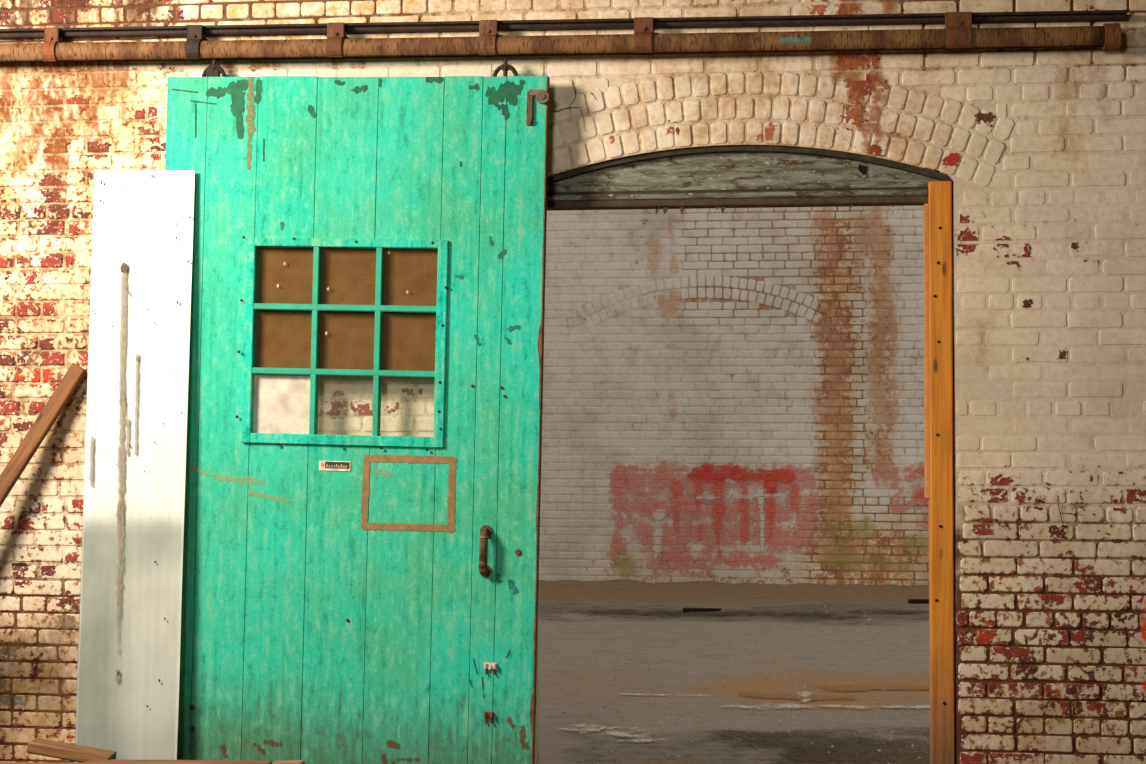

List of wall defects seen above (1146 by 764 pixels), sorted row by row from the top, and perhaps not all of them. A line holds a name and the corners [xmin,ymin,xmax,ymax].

rust [830,51,886,155]
peeling [84,142,114,160]
peeling [134,106,166,161]
peeling [0,129,80,239]
peeling [0,254,73,284]
peeling [956,215,978,256]
peeling [994,235,1031,267]
peeling [0,303,88,456]
peeling [0,504,48,535]
peeling [980,474,1045,511]
peeling [1112,489,1146,514]
peeling [12,537,81,588]